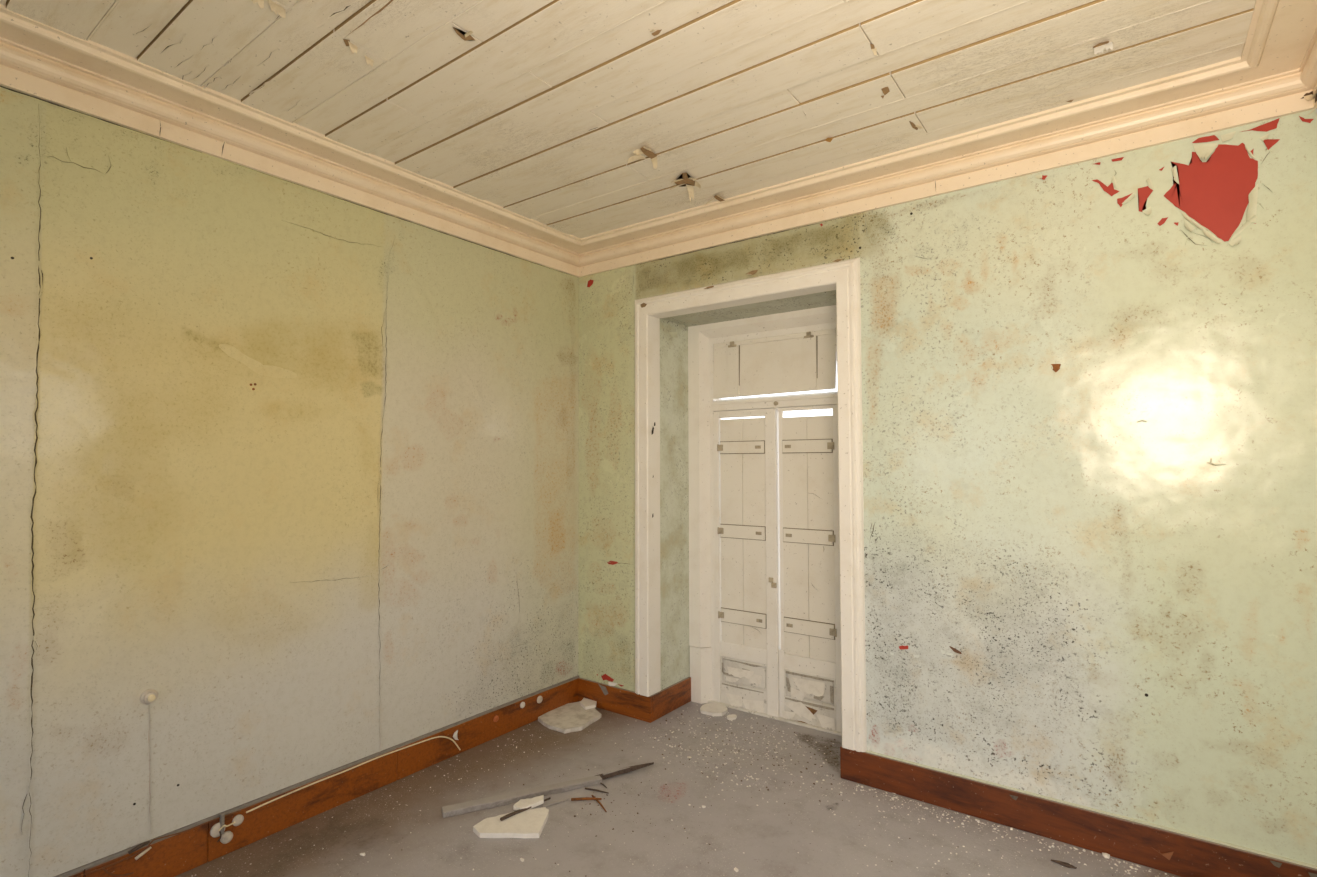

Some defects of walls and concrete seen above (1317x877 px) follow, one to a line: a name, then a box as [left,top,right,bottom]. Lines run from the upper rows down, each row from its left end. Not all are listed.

crack [133,0,398,113]
peeling [1092,118,1280,246]
peeling [1299,87,1317,123]
damp [0,266,436,714]
crack [0,85,572,877]
damp [441,182,1275,723]
damp [864,497,1317,839]